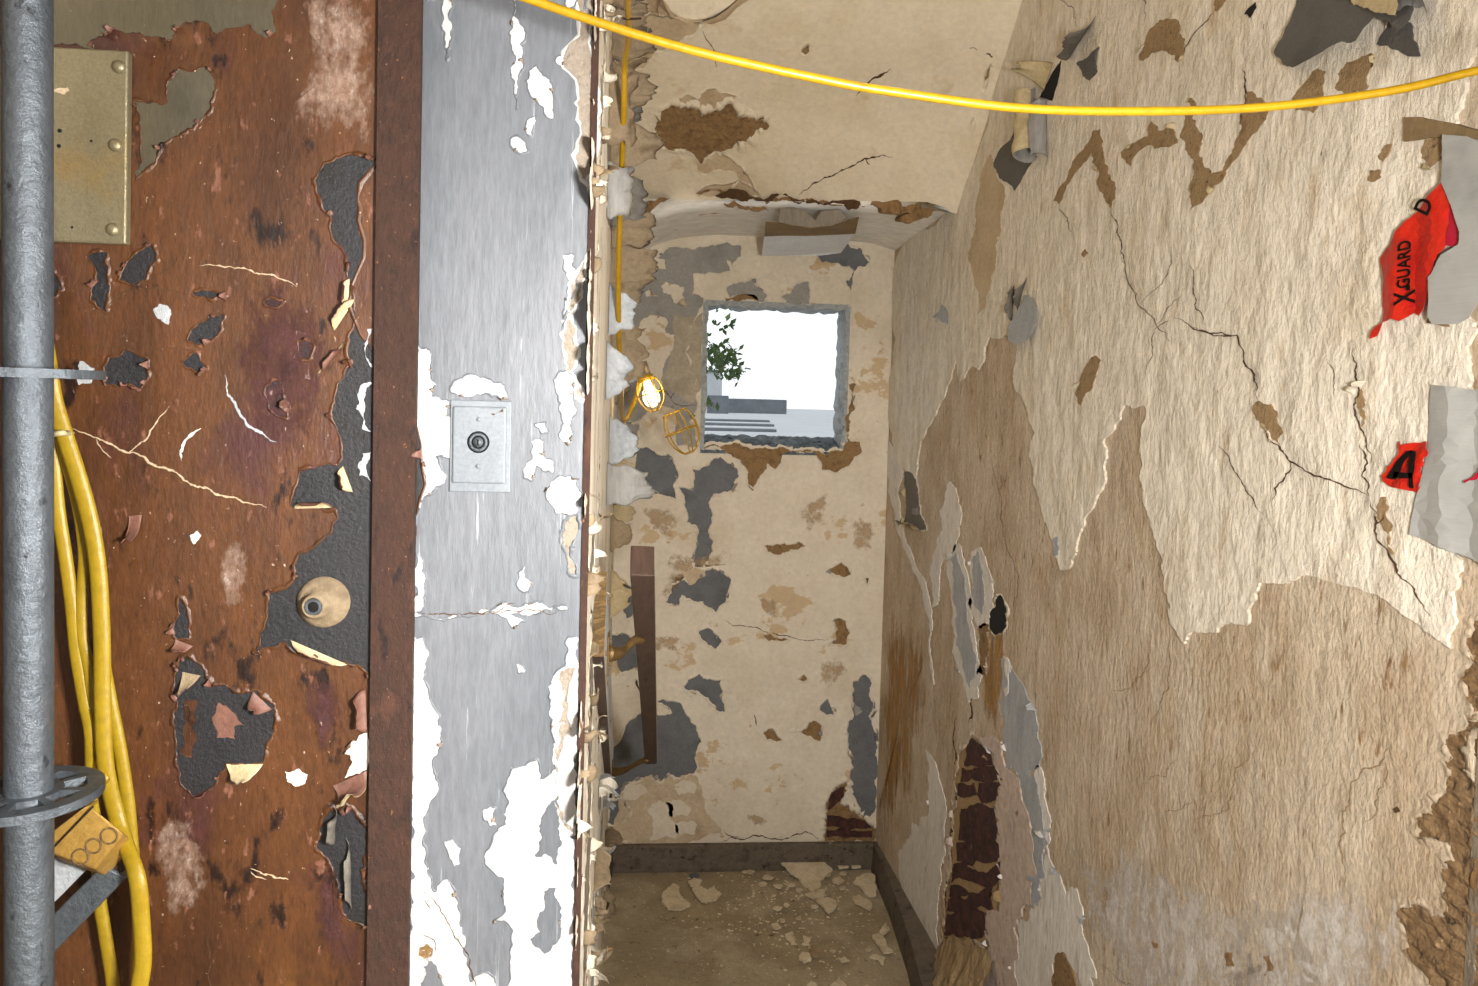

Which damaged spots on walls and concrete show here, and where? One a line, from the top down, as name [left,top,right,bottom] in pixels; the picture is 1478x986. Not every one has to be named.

peeling [54,0,278,49]
corrosion [302,3,364,107]
crack [96,406,170,458]
crack [1110,210,1430,616]
peeling [410,0,1478,986]